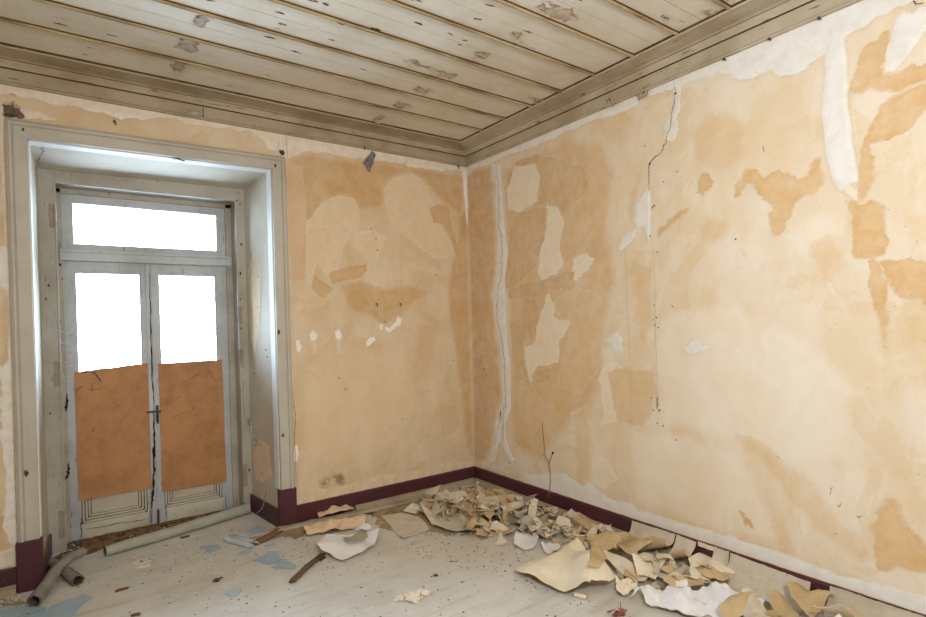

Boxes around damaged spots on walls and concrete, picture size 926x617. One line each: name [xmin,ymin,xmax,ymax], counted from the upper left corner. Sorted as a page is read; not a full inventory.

flaking render [0,0,916,172]
flaking render [0,100,58,569]
crack [477,162,522,477]
flaking render [524,471,926,614]